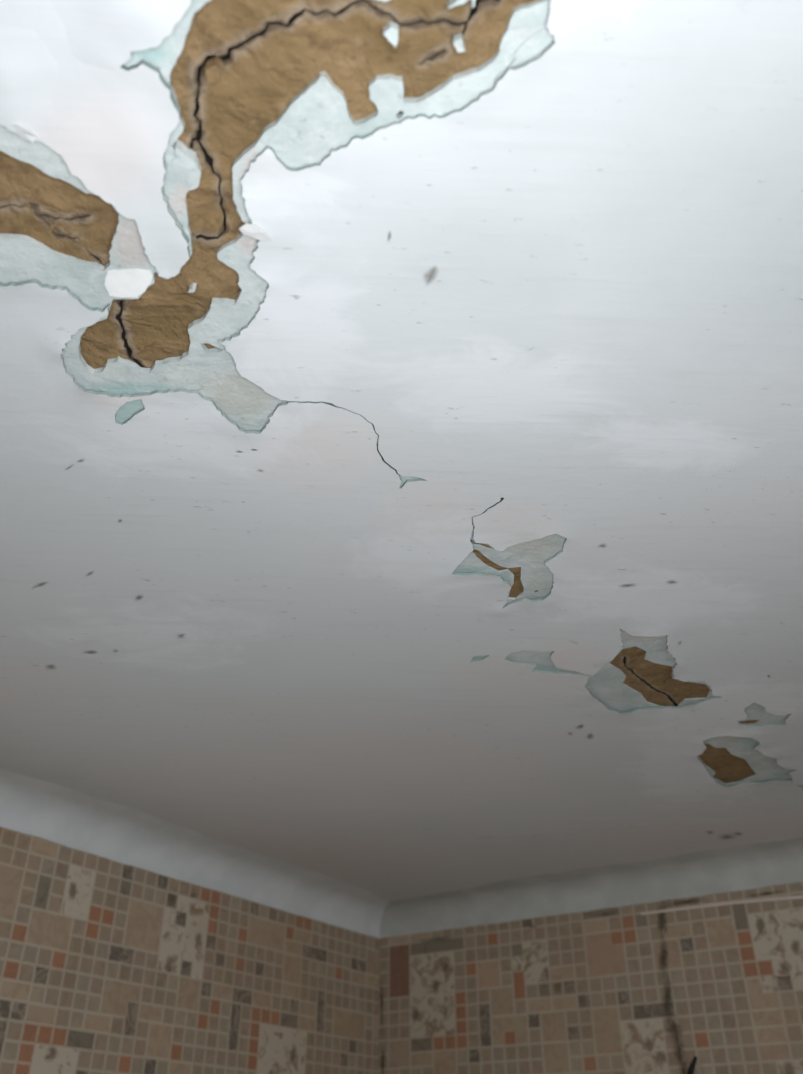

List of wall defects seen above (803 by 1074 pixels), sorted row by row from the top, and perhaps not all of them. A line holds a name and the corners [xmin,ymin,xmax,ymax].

spalling [0,0,555,431]
crack [289,401,397,473]
spalling [453,517,566,605]
spalling [506,629,713,713]
spalling [738,702,788,725]
spalling [697,736,803,788]
water stain [659,900,696,929]